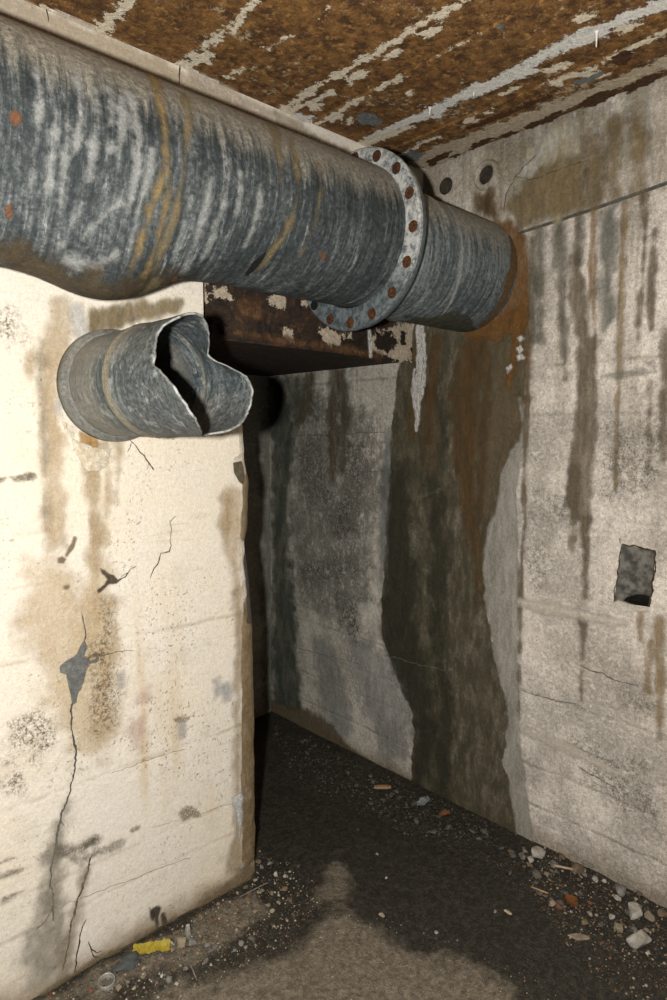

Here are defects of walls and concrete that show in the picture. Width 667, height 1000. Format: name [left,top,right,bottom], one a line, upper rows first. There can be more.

corrosion [426,110,562,167]
corrosion [467,95,552,129]
corrosion [576,70,667,109]
corrosion [465,190,531,386]
water stain [28,299,183,472]
water stain [292,95,667,841]
spalling [98,569,120,593]
crack [117,516,176,581]
crack [81,612,133,656]
water stain [262,512,367,759]
water stain [11,711,51,759]
crack [36,704,189,972]